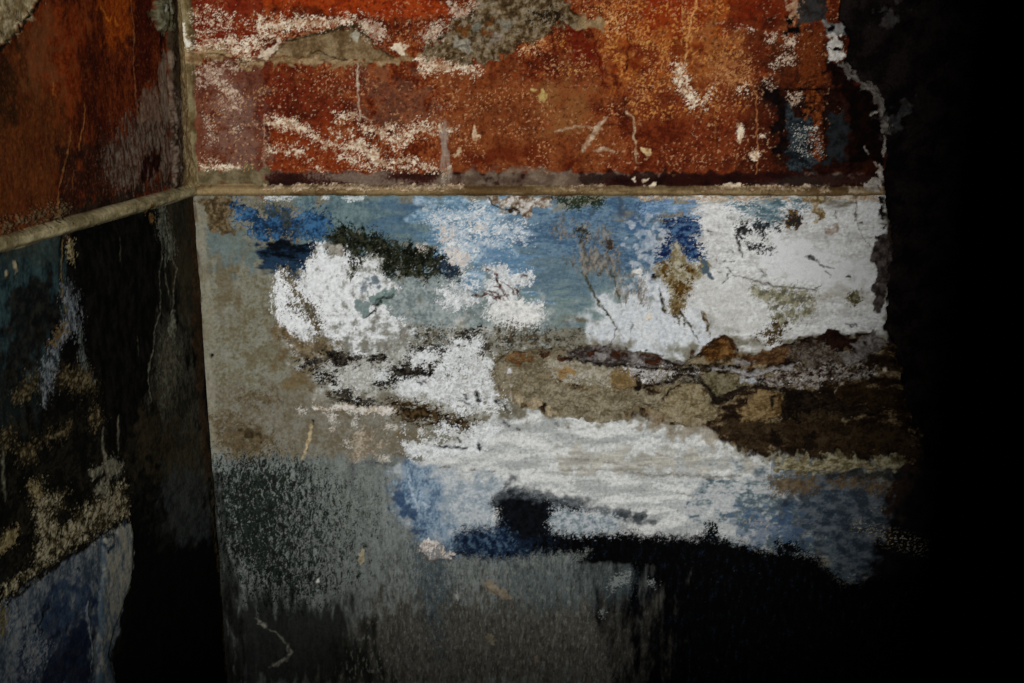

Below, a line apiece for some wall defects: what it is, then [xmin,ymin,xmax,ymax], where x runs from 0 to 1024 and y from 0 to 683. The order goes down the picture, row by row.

spalling [93,0,806,237]
crack [579,268,635,343]
flaking render [259,0,1024,474]
water stain [208,377,1024,683]